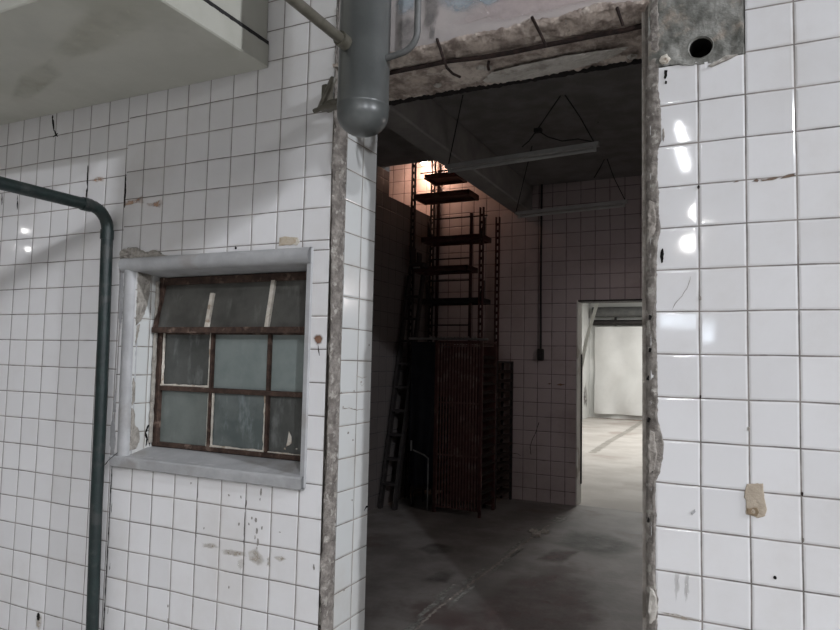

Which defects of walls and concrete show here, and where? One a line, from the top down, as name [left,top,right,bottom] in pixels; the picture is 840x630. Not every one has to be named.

spalling [119,247,168,259]
spalling [135,272,151,345]
spalling [389,0,745,630]
spalling [319,110,354,630]
spalling [130,378,140,450]